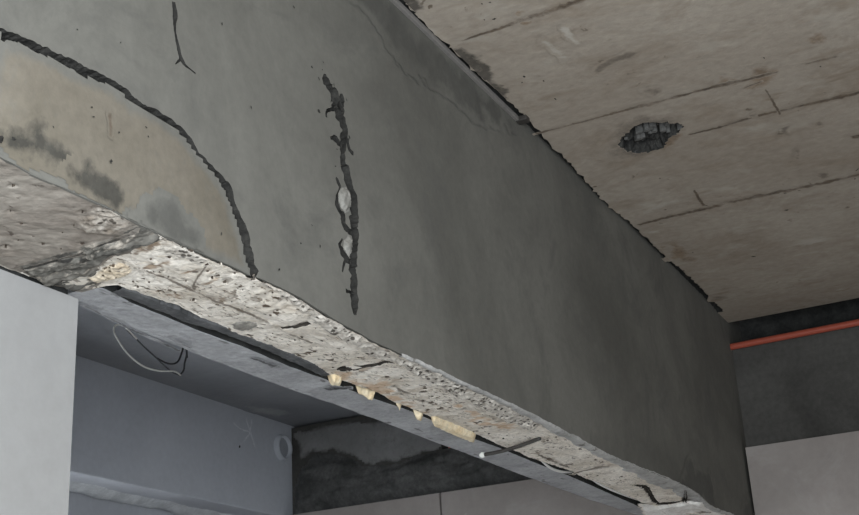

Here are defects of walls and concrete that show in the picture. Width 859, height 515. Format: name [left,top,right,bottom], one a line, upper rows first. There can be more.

crack [172,1,195,73]
crack [0,28,259,278]
crack [300,62,359,315]
spalling [618,121,684,153]
spalling [17,205,236,292]
spalling [251,277,542,432]
spalling [638,500,725,515]